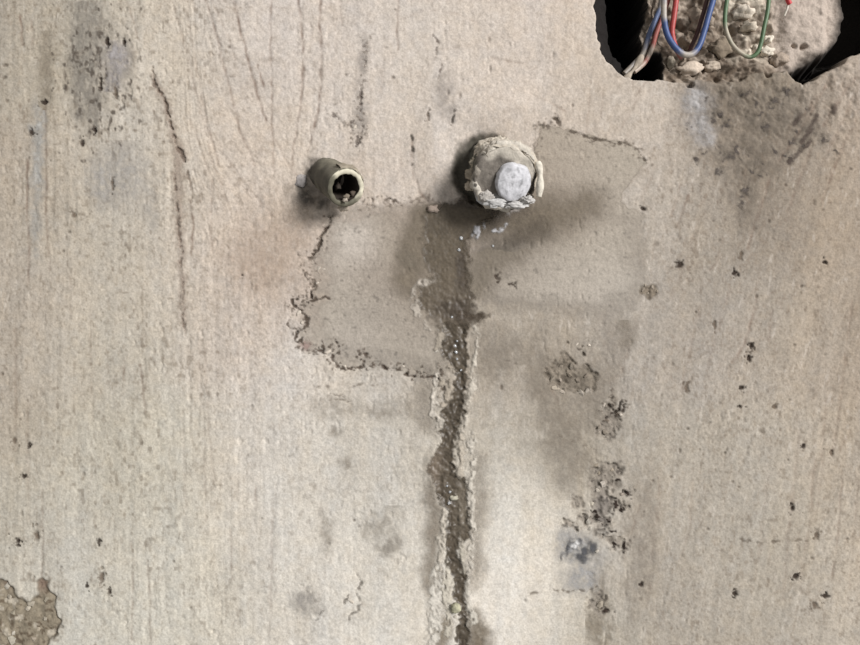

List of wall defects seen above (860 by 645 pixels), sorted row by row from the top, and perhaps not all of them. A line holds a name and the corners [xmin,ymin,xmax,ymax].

hole [593,0,860,88]
crack [287,218,447,390]
water stain [397,135,596,645]
flaking render [544,358,597,396]
flaking render [563,462,631,554]
flaking render [0,578,62,645]